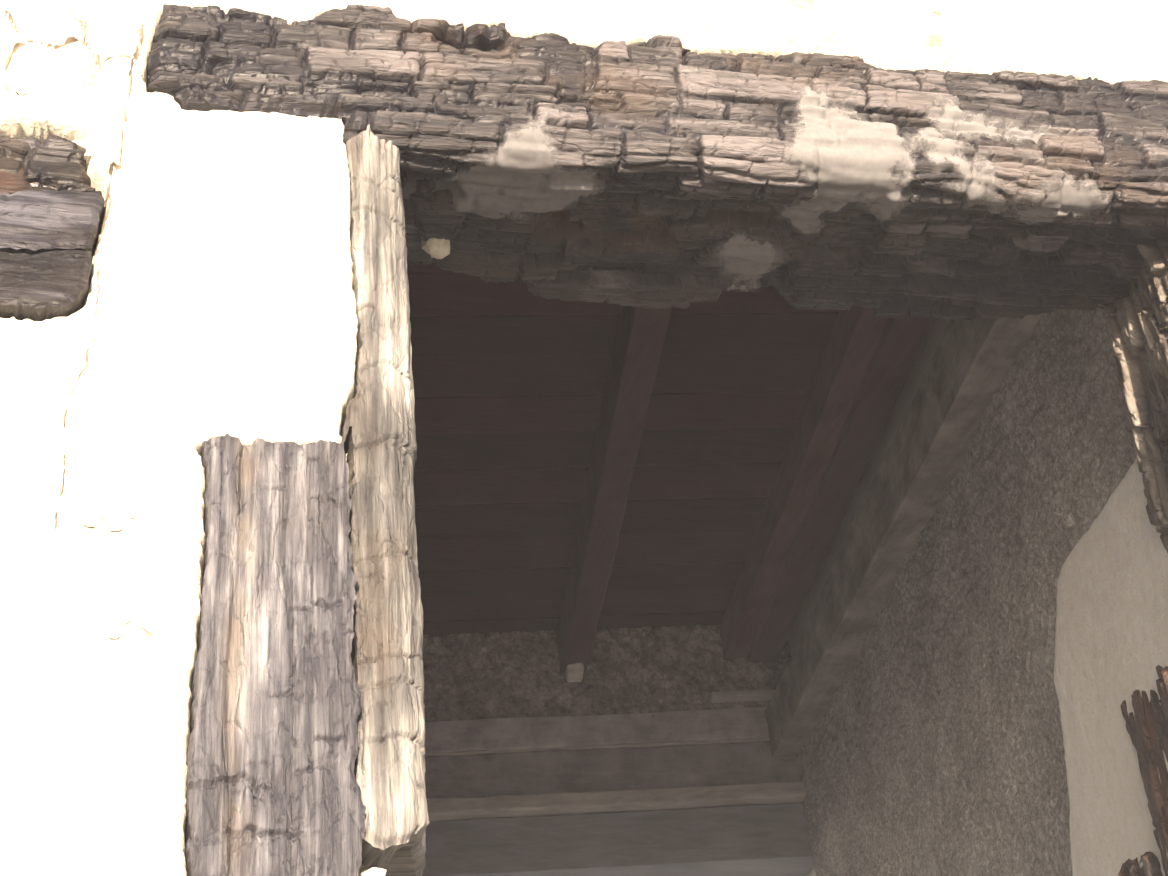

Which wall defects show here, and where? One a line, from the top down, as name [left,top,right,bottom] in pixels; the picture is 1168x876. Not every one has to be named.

crack [1,10,144,534]